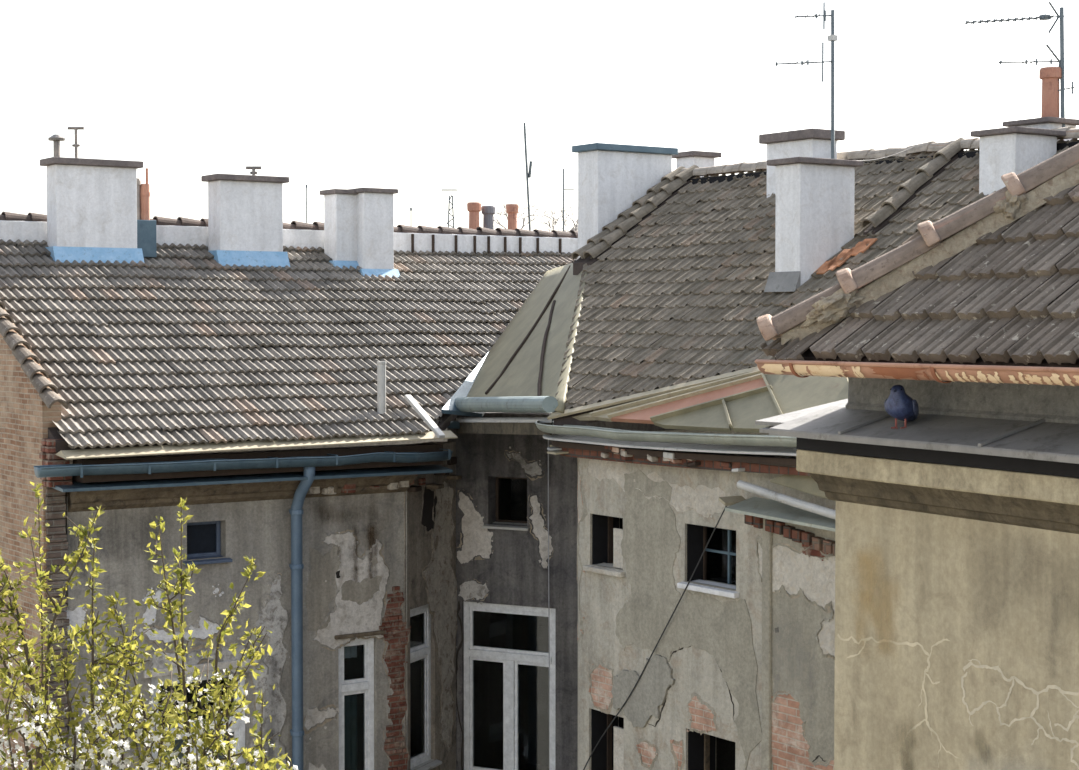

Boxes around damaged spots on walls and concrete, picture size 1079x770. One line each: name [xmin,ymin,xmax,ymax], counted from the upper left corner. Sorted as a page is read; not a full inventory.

flaking render [504,447,554,572]
flaking render [139,573,290,770]
flaking render [303,529,411,770]
flaking render [420,479,495,756]
flaking render [589,660,614,714]
flaking render [756,535,835,660]
flaking render [771,691,834,770]
crack [837,634,1079,769]